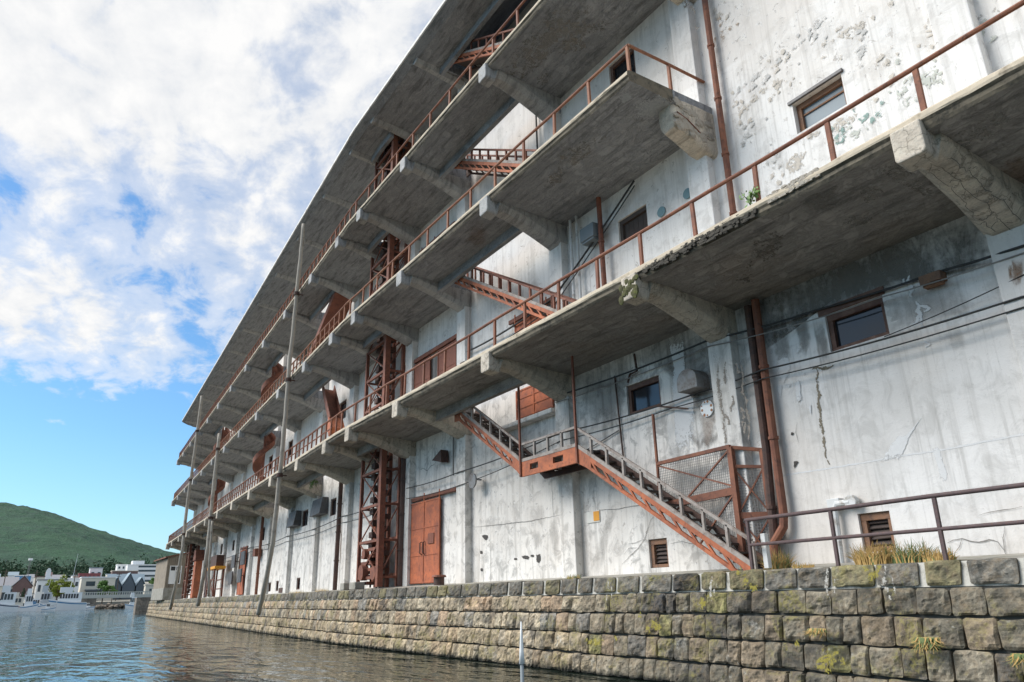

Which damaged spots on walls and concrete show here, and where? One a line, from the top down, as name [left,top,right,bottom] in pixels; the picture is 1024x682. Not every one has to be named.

spalling [641,15,945,274]
crack [928,158,1021,232]